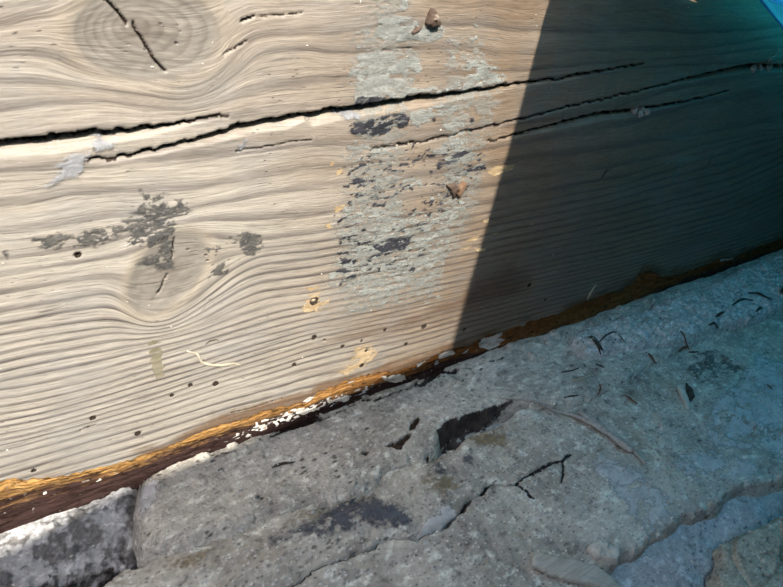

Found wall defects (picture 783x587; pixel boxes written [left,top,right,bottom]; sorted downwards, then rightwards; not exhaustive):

crack [103,0,166,71]
peeling [349,0,507,99]
crack [0,63,643,162]
peeling [410,105,475,162]
peeling [488,164,515,176]
crack [370,63,783,151]
peeling [302,173,467,314]
peeling [339,343,377,375]
crack [266,357,504,438]
spalling [386,418,420,450]
crack [444,454,572,530]